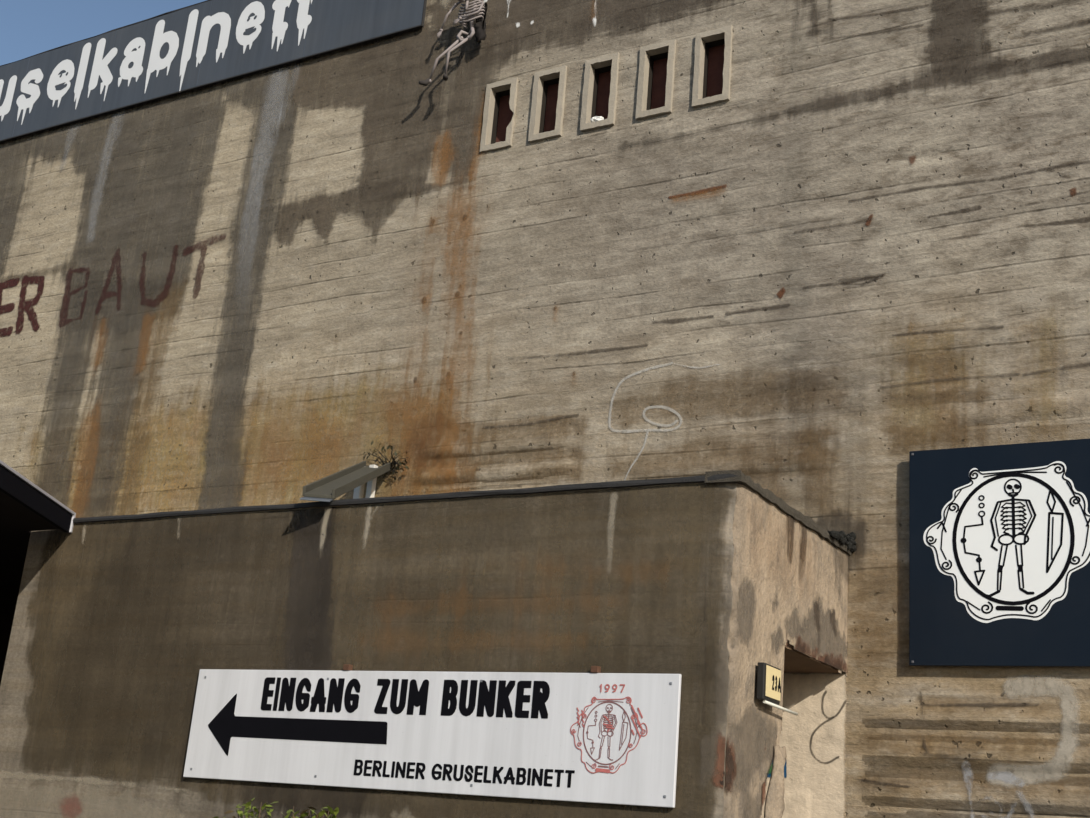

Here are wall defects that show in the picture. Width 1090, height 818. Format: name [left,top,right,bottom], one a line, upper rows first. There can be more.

leakage [757,0,1090,122]
leakage [0,0,730,818]
leakage [788,515,807,562]